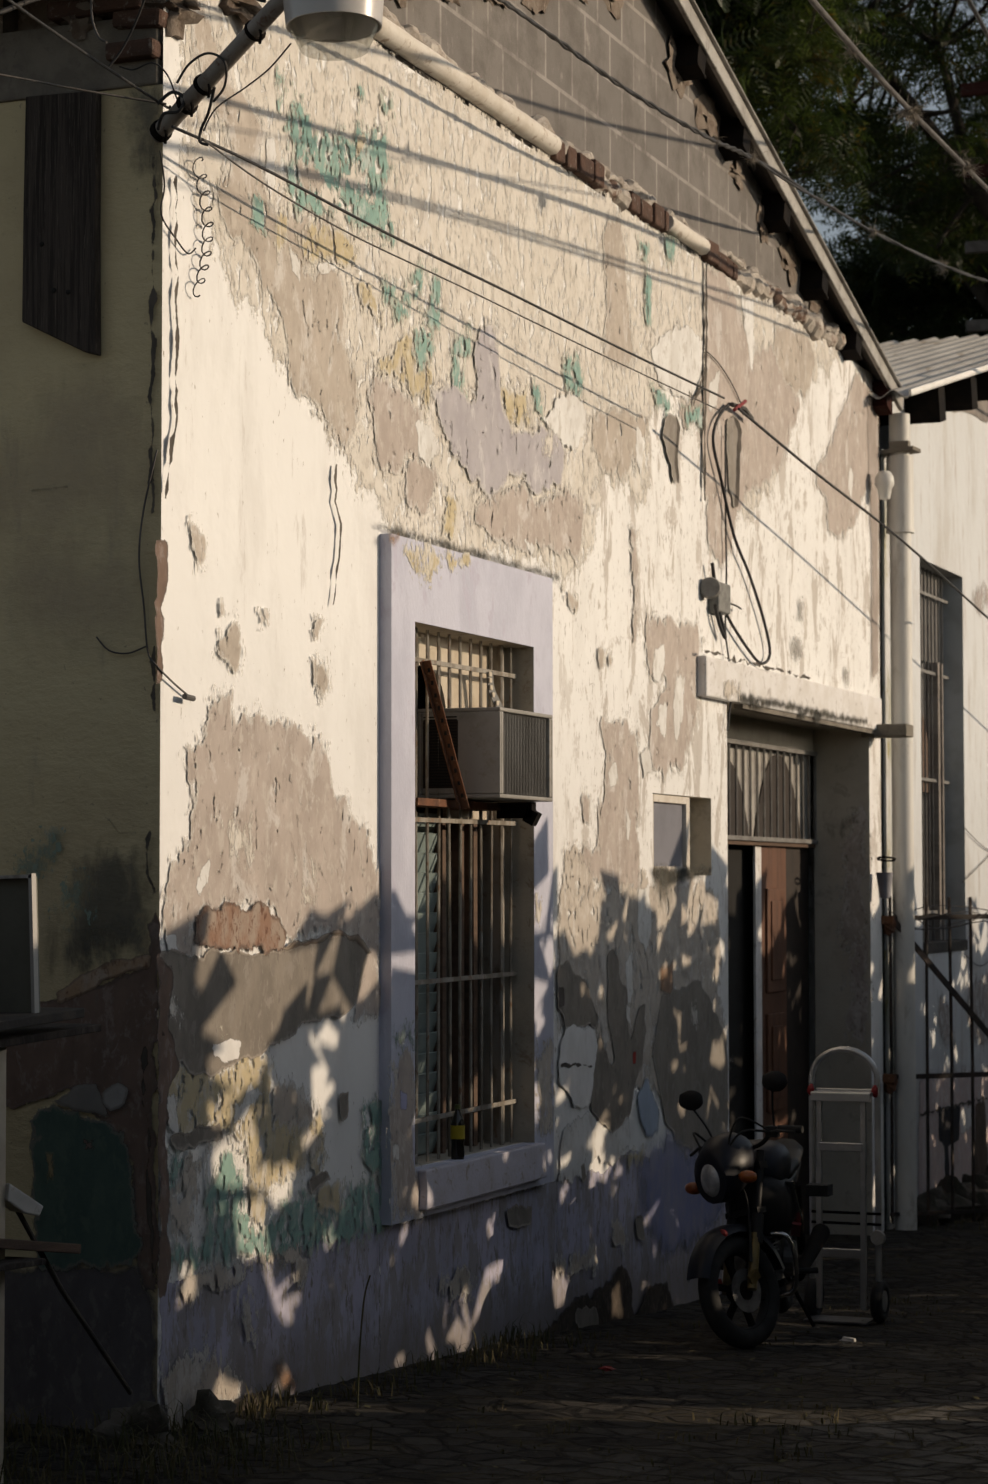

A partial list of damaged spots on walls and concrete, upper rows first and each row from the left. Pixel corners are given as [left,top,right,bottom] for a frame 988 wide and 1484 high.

peeling [188,0,818,615]
peeling [815,367,873,543]
damp [66,858,146,961]
peeling [4,597,427,1432]
peeling [436,1261,477,1306]
peeling [534,520,733,1336]